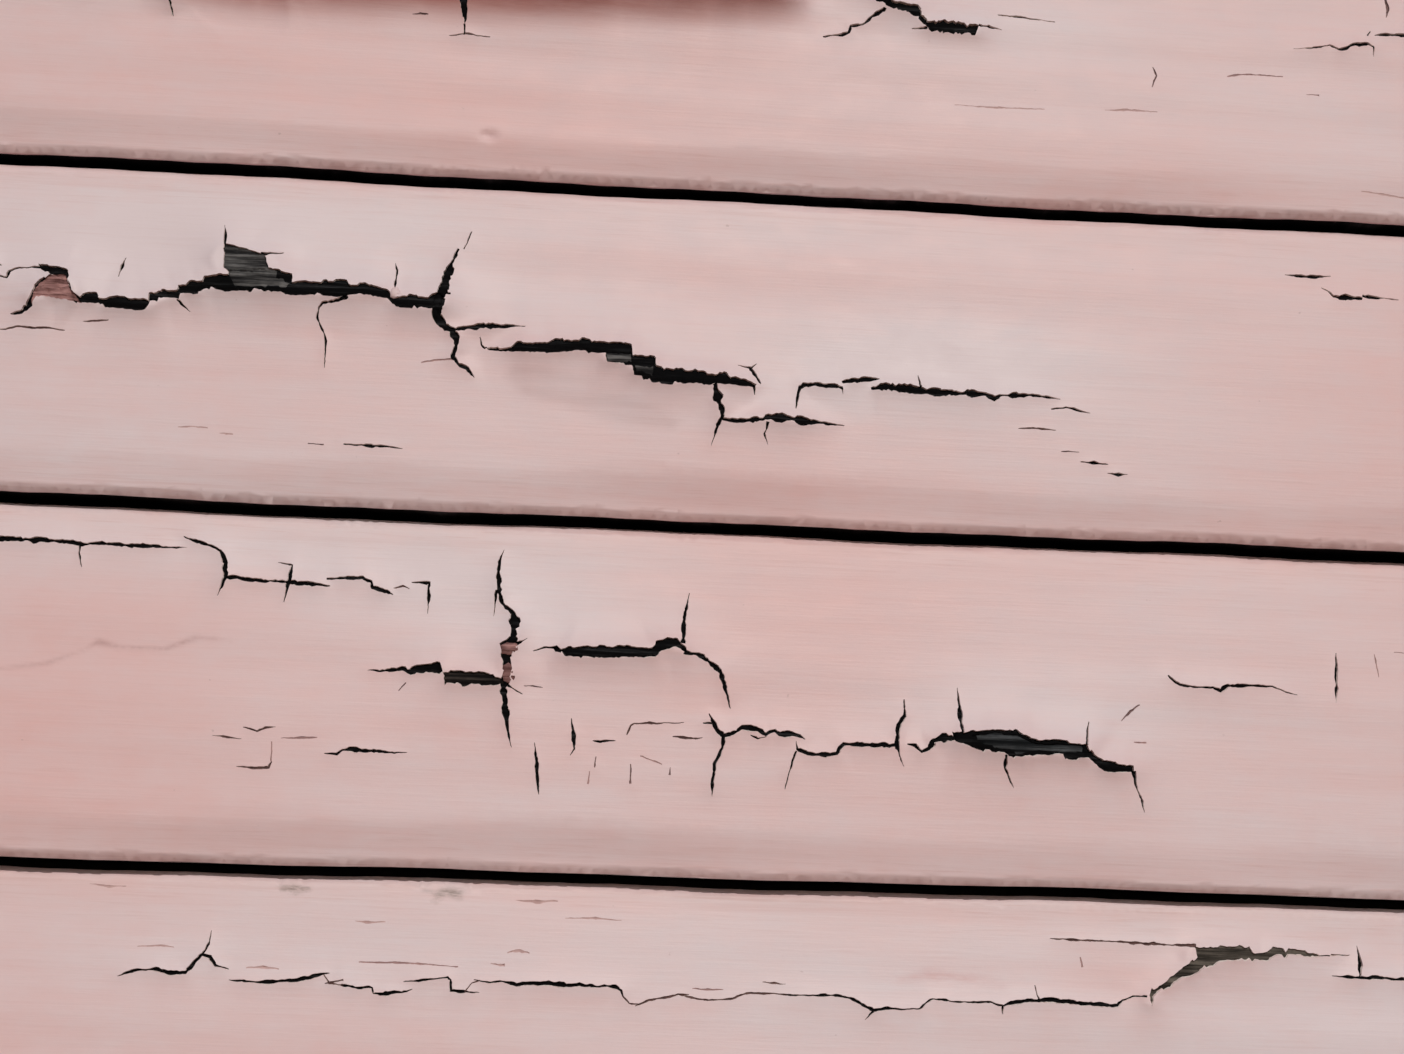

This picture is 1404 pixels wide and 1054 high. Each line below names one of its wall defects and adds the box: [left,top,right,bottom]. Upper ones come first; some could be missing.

peeling [449,0,490,37]
peeling [10,264,82,315]
crack [0,228,1128,477]
crack [0,535,431,614]
crack [368,551,1146,812]
crack [1168,675,1297,695]
crack [1332,653,1340,702]
crack [212,726,407,770]
crack [118,930,1147,1020]
crack [1332,948,1404,981]